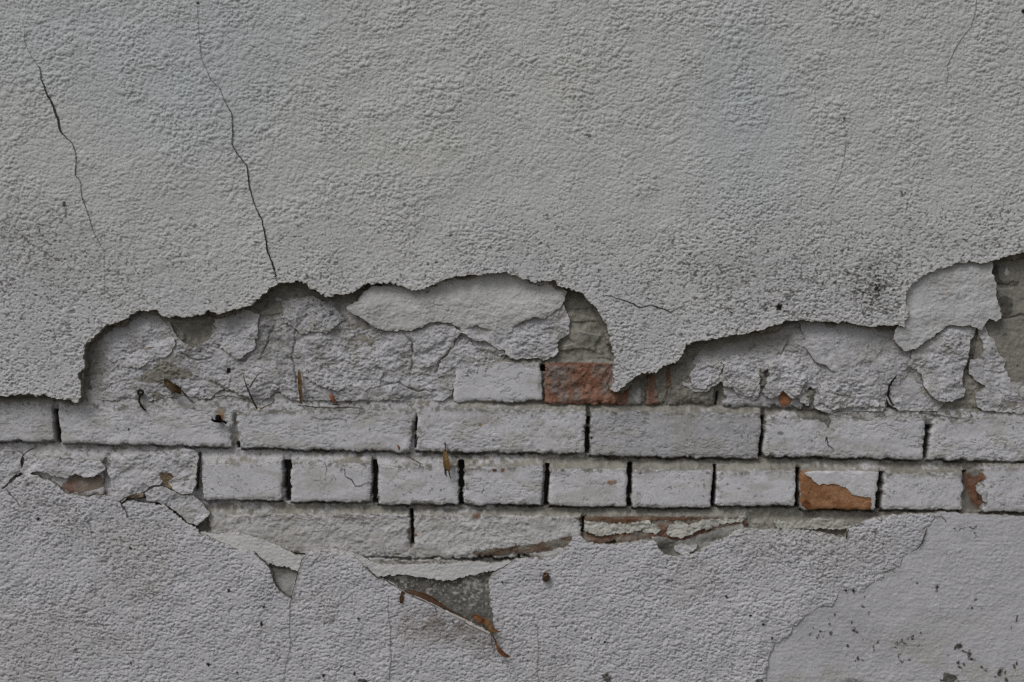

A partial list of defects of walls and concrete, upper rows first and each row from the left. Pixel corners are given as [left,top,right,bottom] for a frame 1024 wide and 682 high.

crack [24,26,114,250]
crack [197,12,279,285]
spalling [90,257,1024,428]
peeling [0,446,211,525]
flaking render [795,469,879,510]
flaking render [966,473,988,505]
peeling [472,536,572,556]
peeling [576,516,744,556]
spalling [270,565,299,596]